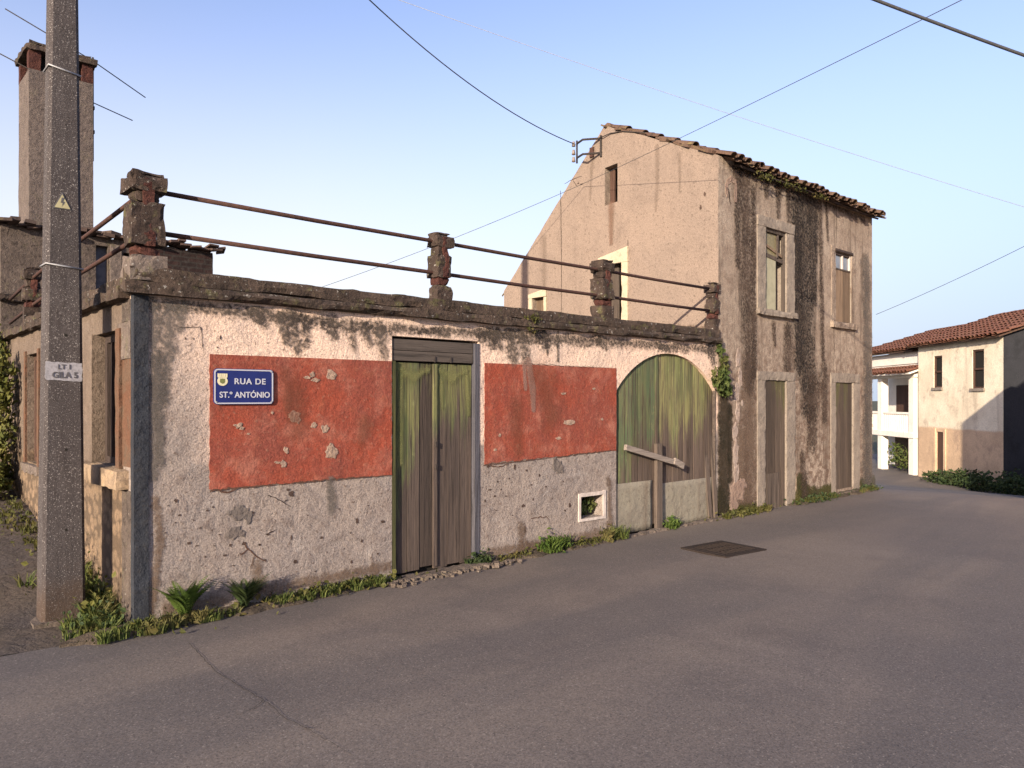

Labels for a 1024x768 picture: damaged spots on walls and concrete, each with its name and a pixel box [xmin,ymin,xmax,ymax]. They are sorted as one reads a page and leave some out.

peeling [288,410,338,459]
peeling [303,369,337,382]
leakage [148,163,865,515]
leakage [862,256,874,485]